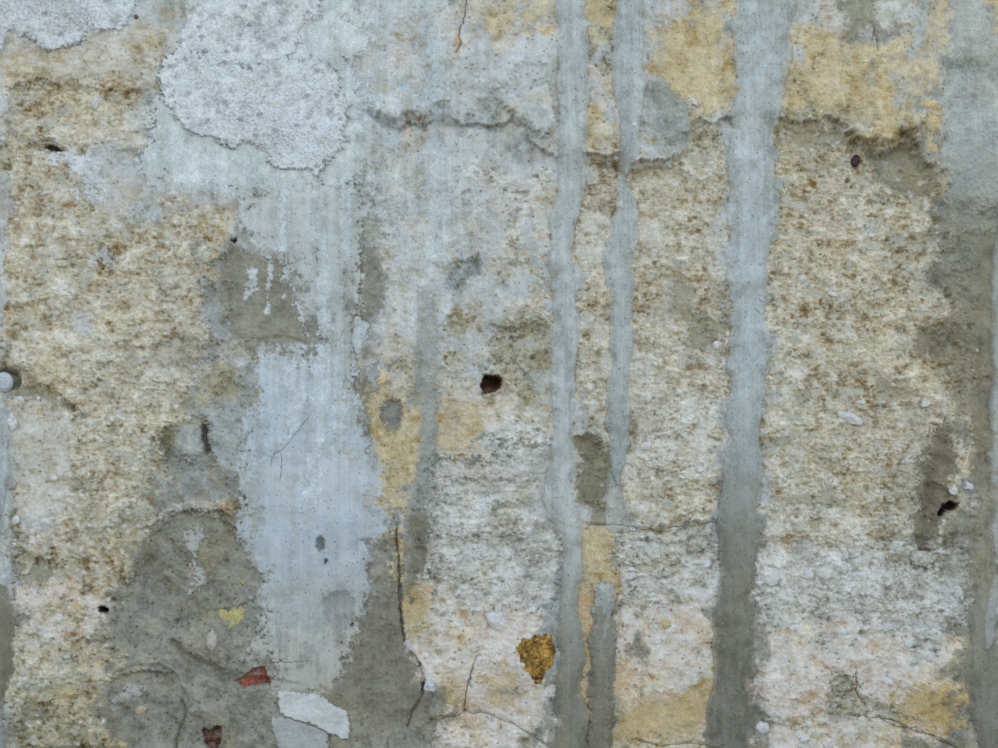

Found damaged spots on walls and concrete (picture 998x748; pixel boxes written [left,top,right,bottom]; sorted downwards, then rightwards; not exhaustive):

water stain [900,0,932,67]
water stain [0,238,24,610]
spalling [0,0,351,599]
water stain [132,0,498,748]
crack [395,521,425,728]
crack [440,655,548,746]
water stain [570,431,617,528]
water stain [905,0,998,601]